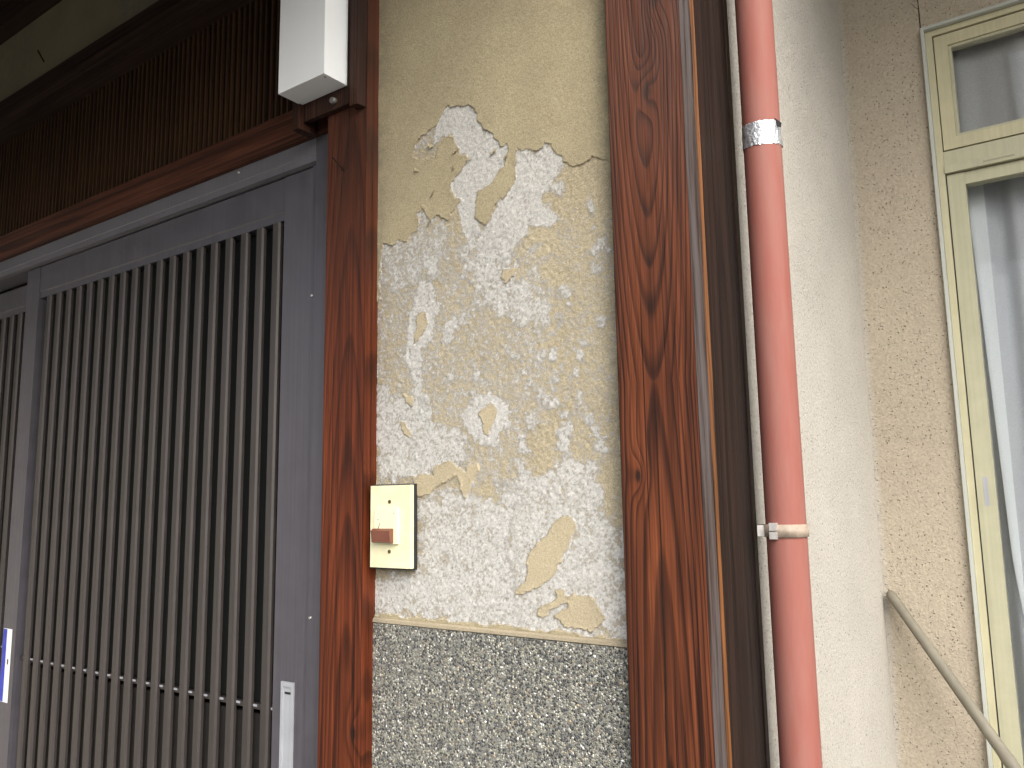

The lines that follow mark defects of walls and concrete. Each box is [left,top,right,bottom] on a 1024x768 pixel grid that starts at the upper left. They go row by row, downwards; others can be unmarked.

peeling [375,104,627,641]